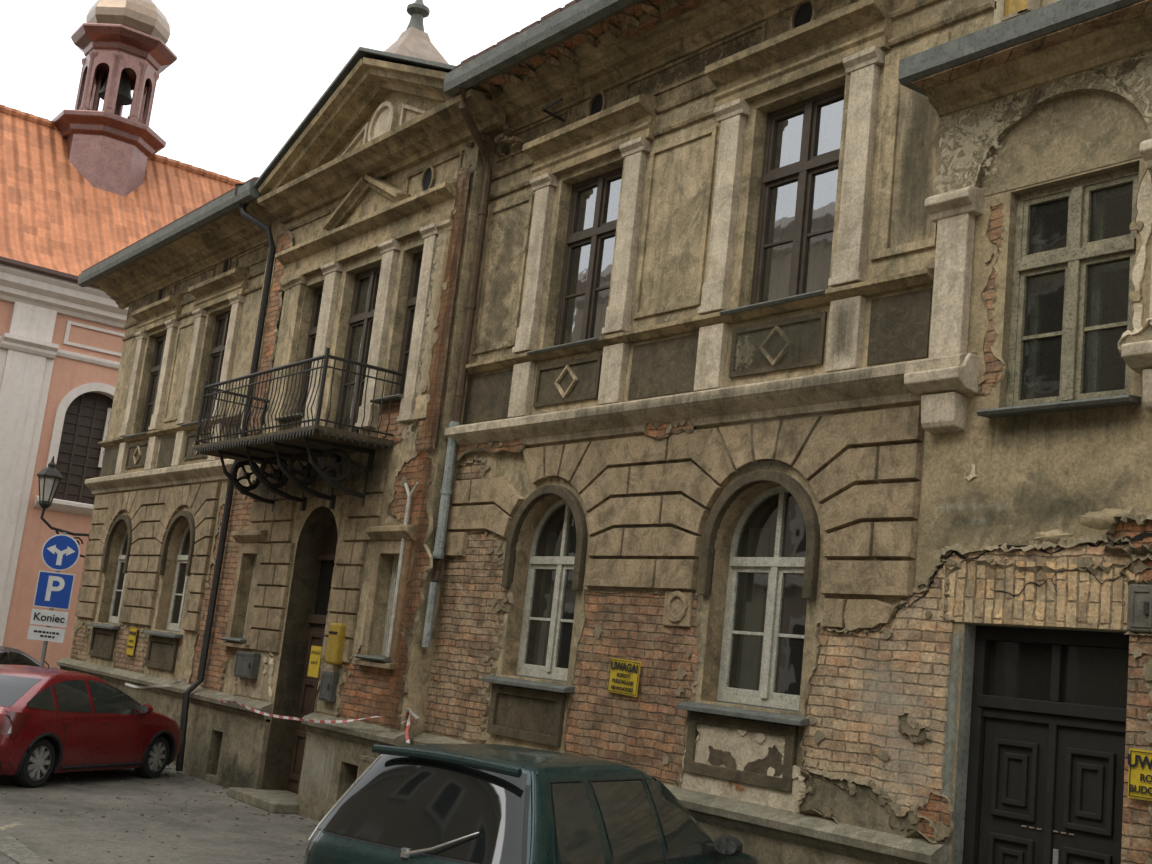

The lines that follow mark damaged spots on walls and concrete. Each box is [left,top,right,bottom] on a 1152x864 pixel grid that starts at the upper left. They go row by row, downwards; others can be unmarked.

peeling [473,189,534,358]
peeling [977,202,1006,396]
peeling [1129,170,1152,330]
flaking render [314,165,514,744]
flaking render [455,438,526,481]
crack [887,532,1152,628]
flaking render [563,507,1152,864]